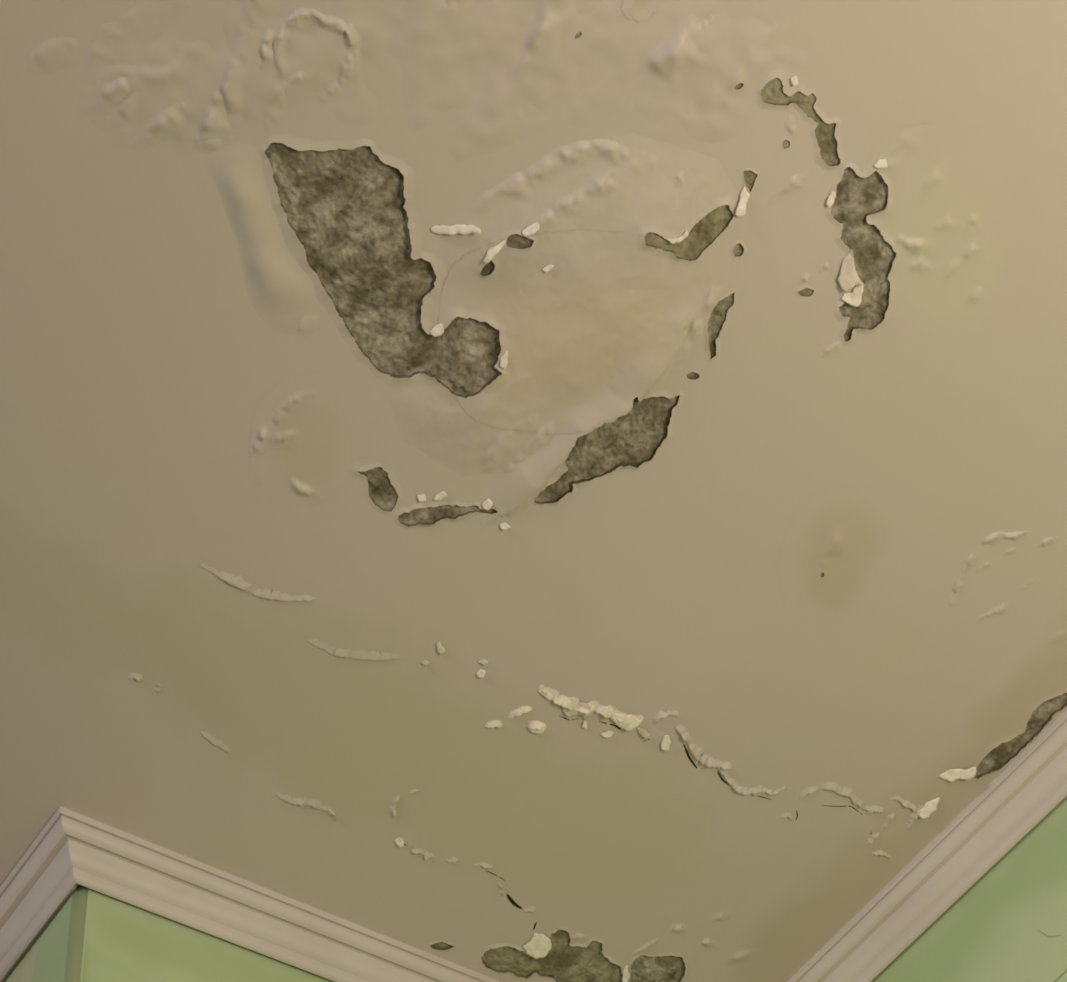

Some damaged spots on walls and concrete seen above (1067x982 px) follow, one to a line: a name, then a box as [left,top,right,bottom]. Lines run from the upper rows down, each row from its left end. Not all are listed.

spalling [259,134,508,408]
spalling [480,222,540,276]
spalling [635,168,760,264]
spalling [735,70,896,345]
spalling [686,289,738,381]
spalling [533,390,685,507]
spalling [353,463,511,530]
spalling [939,693,1067,782]
spalling [479,928,688,982]